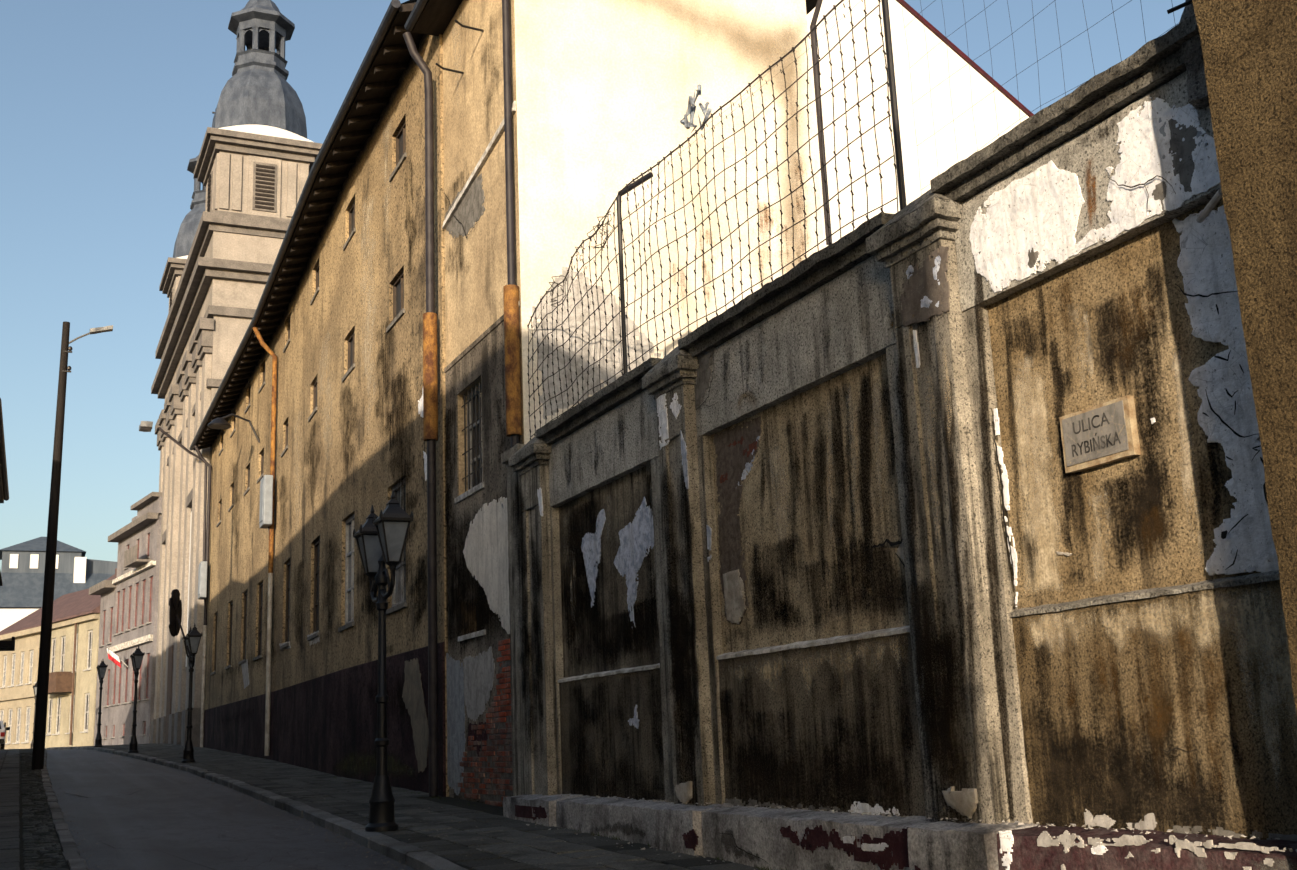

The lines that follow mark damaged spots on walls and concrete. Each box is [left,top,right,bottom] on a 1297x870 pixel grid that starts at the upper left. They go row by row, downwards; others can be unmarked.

water stain [280,160,428,632]
peeling [581,497,654,628]
water stain [562,465,700,806]
spalling [706,416,762,625]
water stain [719,357,980,870]
peeling [969,97,1220,293]
water stain [975,265,1297,838]
crack [1175,284,1238,314]
crack [1202,350,1268,570]
peeling [721,797,921,870]
peeling [999,830,1014,870]
peeling [1037,809,1297,870]